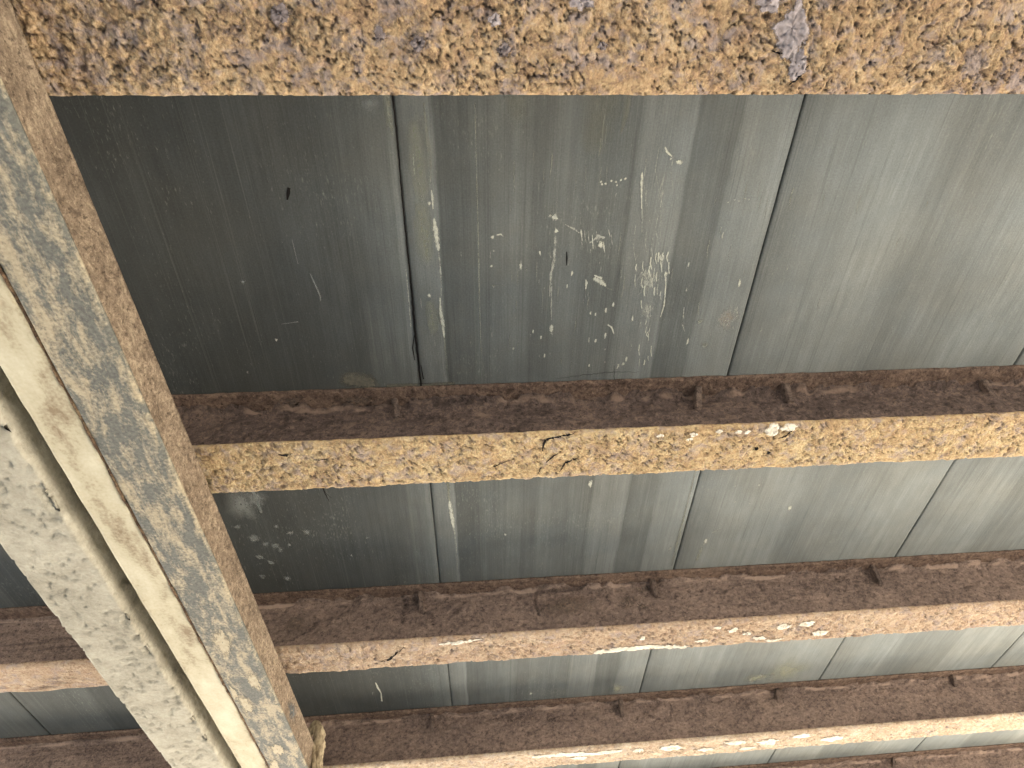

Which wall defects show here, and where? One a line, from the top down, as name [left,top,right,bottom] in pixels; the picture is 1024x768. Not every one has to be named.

rust [488,12,501,27]
rust [569,0,594,11]
rust [755,0,809,80]
peeling [549,214,612,296]
peeling [635,252,670,361]
crack [537,432,577,475]
rust [715,621,828,642]
rust [698,733,843,752]